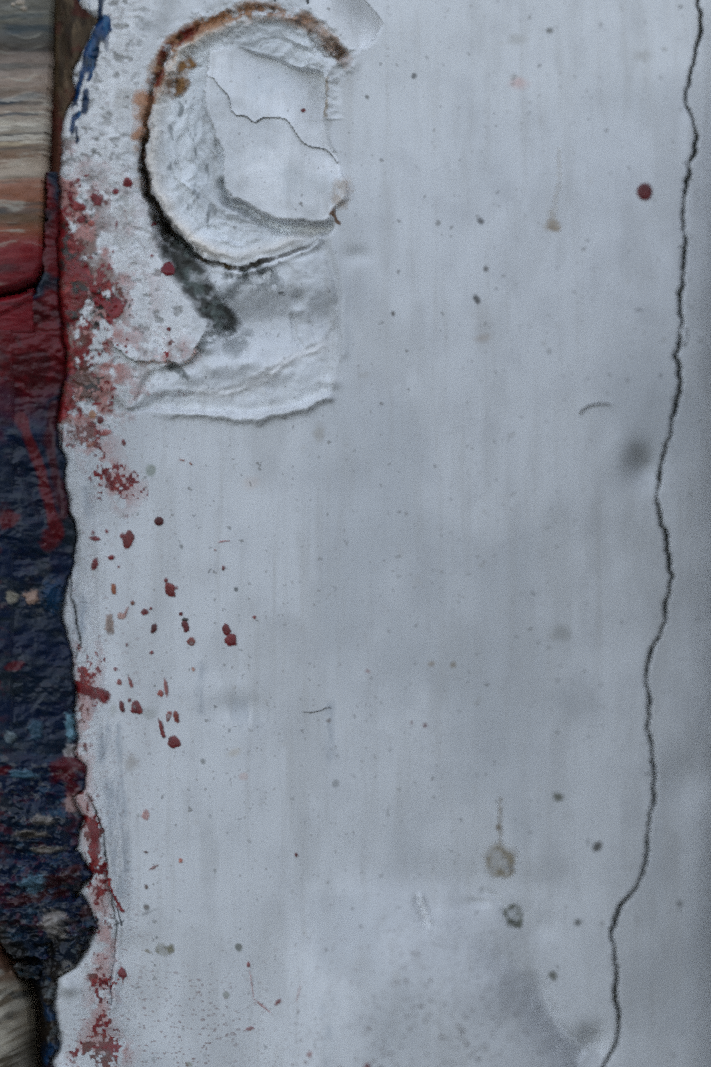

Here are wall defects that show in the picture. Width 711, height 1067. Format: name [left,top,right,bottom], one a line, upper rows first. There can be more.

corrosion [133,2,344,239]
crack [603,0,703,1067]
peeling [25,934,91,1067]